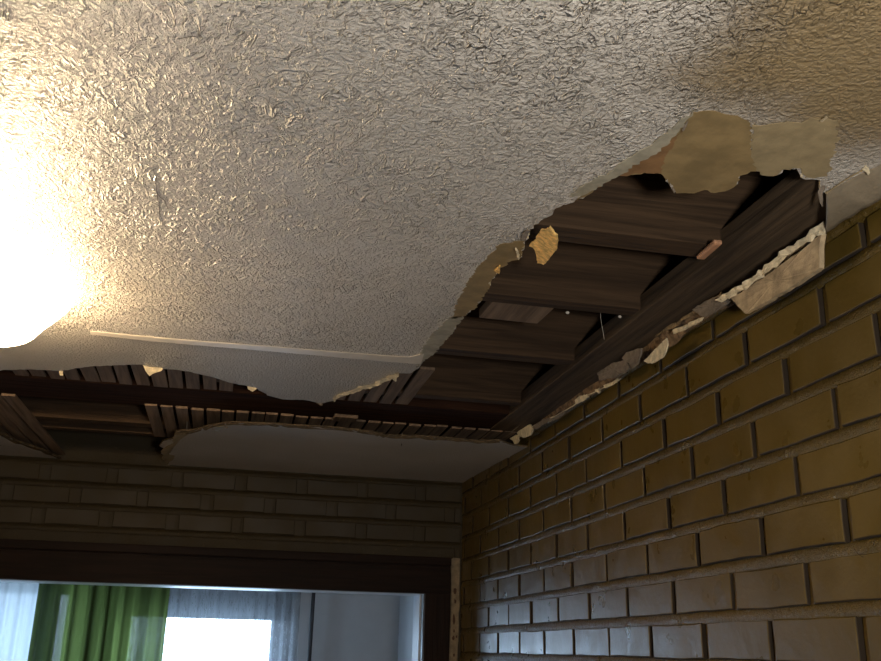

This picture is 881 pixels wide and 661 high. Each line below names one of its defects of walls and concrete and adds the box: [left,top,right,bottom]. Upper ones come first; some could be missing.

spalling [569,109,840,200]
spalling [143,365,163,376]
spalling [333,372,399,402]
spalling [416,226,559,368]
flaking render [510,221,827,444]